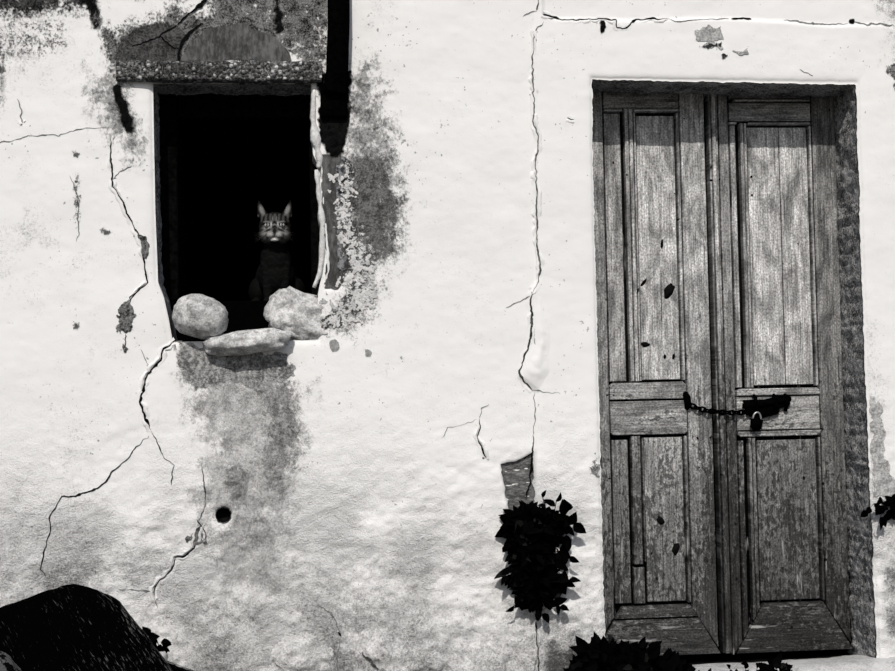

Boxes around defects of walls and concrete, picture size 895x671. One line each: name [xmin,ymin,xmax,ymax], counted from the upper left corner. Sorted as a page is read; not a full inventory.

damp [0,0,86,73]
crack [133,0,207,61]
damp [89,0,328,162]
peeling [695,25,749,59]
crack [788,19,893,27]
crack [0,97,149,305]
damp [337,59,408,305]
crack [506,0,751,452]
crack [40,334,177,578]
crack [119,466,207,608]
damp [182,379,310,592]
spalling [501,451,535,510]